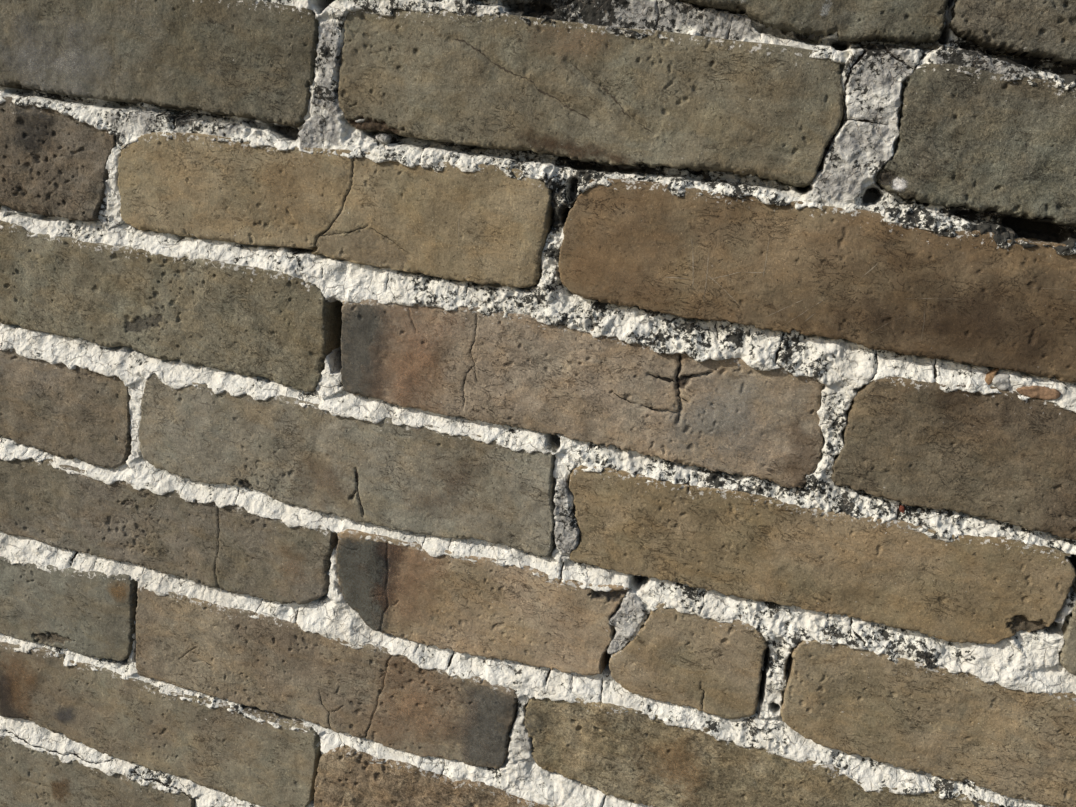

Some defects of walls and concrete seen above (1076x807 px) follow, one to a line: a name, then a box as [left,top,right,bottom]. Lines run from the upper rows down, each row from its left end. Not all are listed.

crack [314,158,411,289]
crack [613,354,712,421]
crack [319,644,419,751]